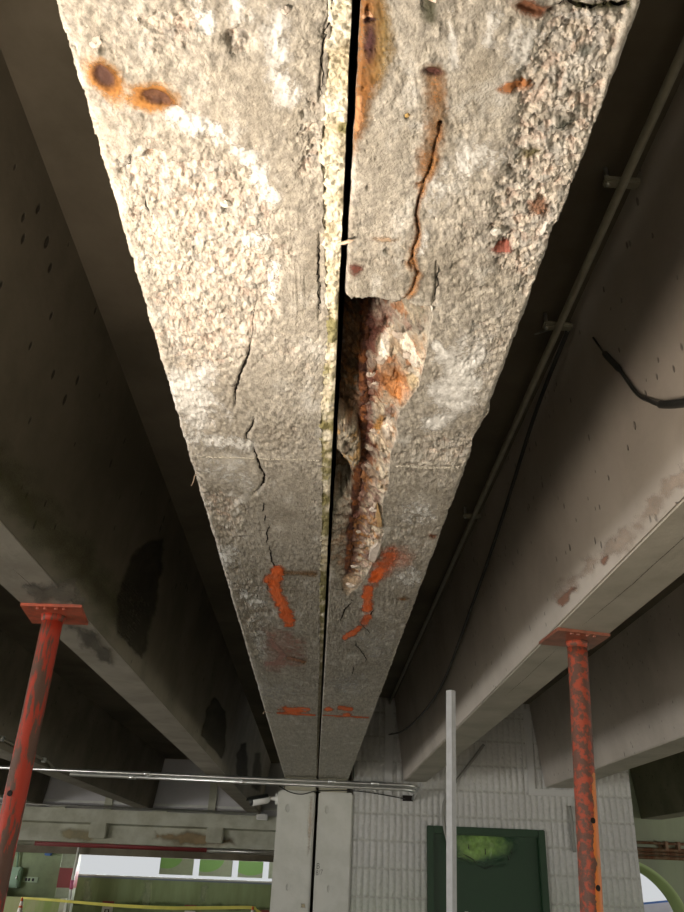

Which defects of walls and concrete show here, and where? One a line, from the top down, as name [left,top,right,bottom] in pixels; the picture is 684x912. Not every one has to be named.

crack [555,0,630,9]
rust [86,62,178,112]
rust [353,0,392,149]
rust [406,67,444,298]
crack [412,142,439,302]
crack [231,297,257,402]
spalling [330,292,433,595]
crack [246,420,299,591]
leakage [117,540,163,658]
leakage [201,698,226,758]
leakage [236,743,261,791]